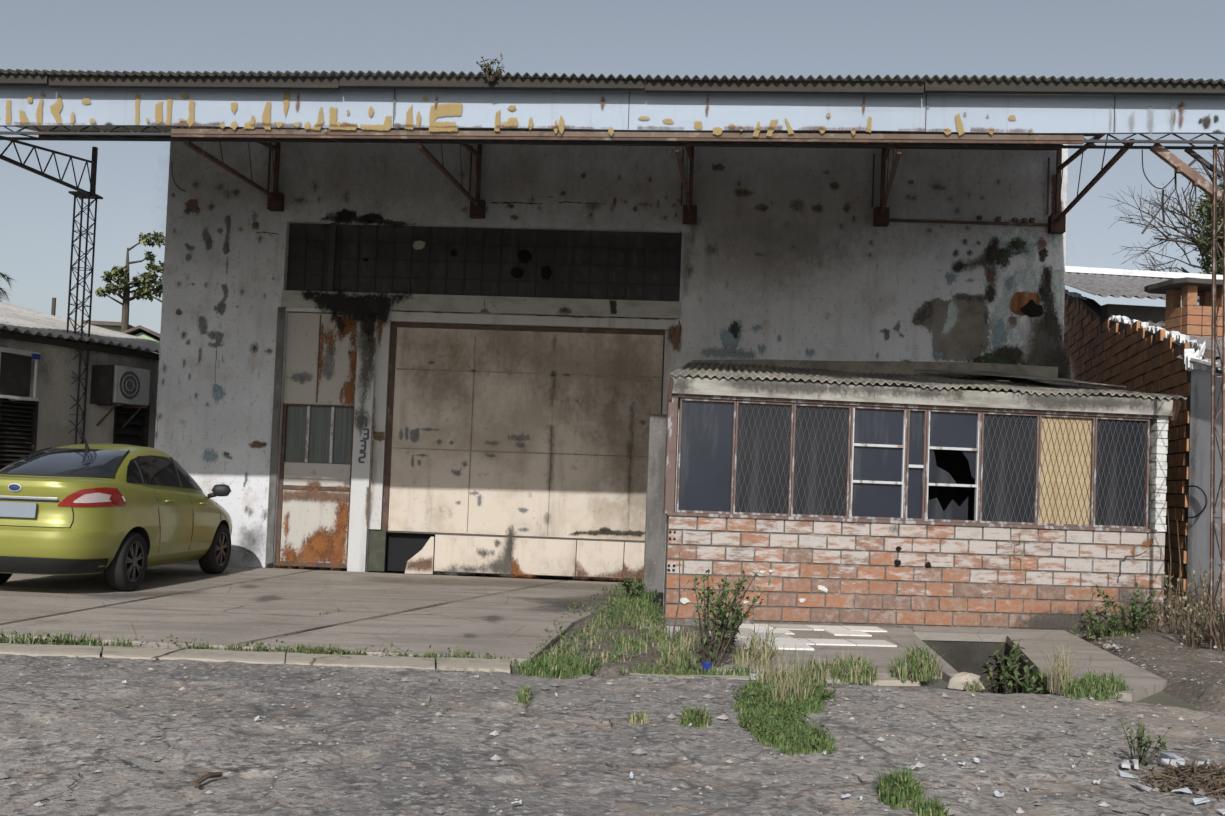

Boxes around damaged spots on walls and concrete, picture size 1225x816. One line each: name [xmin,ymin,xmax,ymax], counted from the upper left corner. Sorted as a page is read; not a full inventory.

flaking render [880,227,1064,362]
rust [287,316,358,405]
water stain [354,320,375,434]
rust [366,398,375,524]
rust [278,482,350,569]